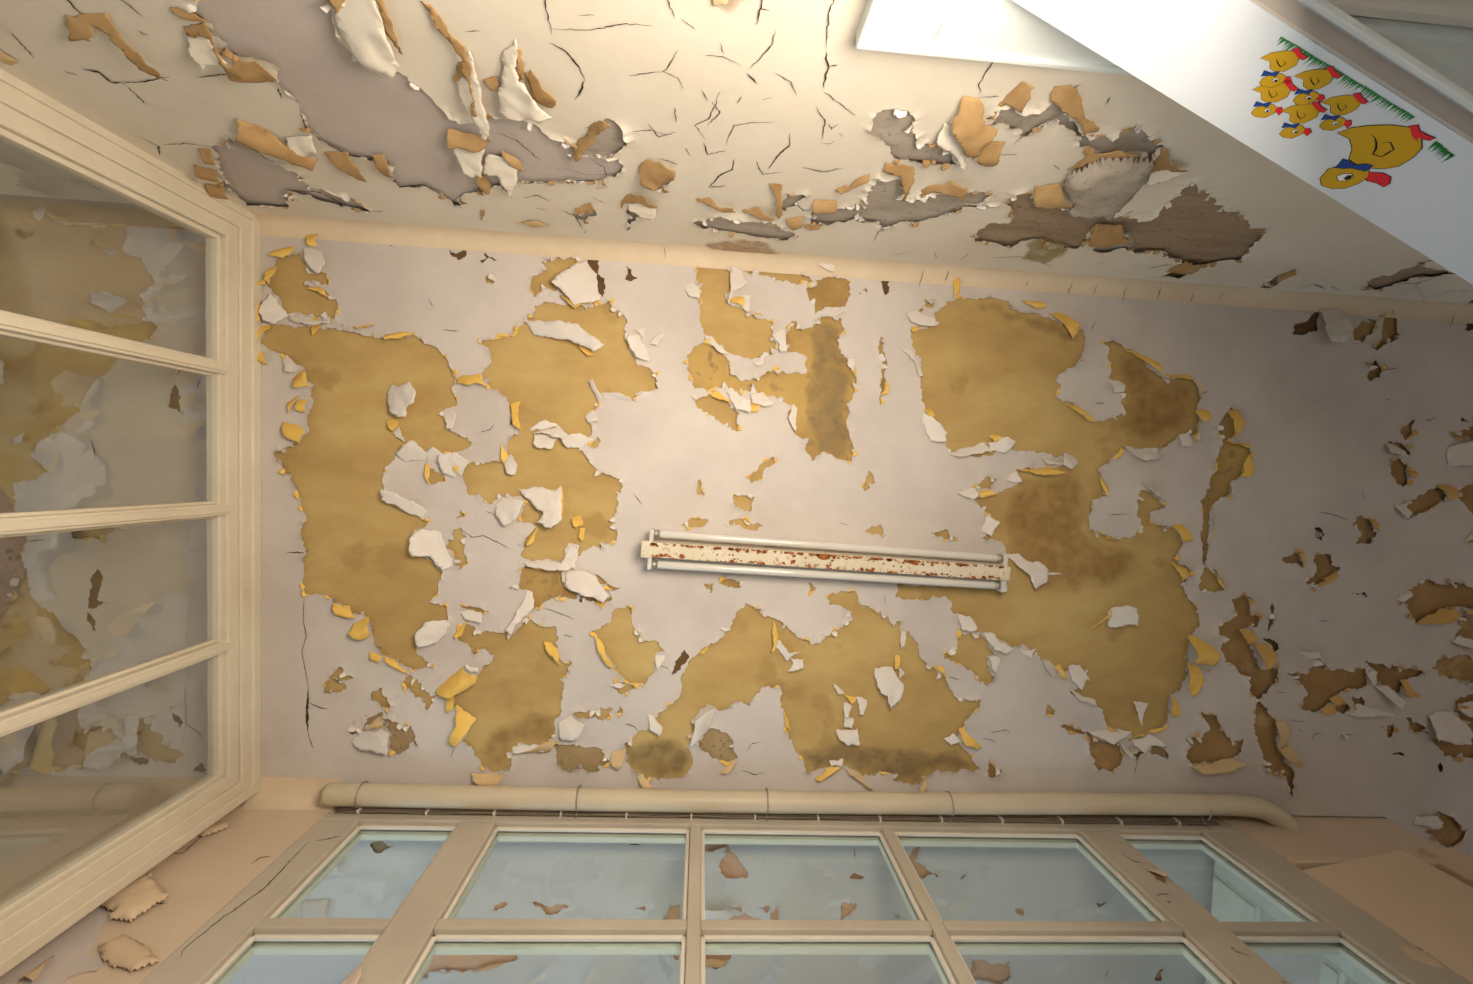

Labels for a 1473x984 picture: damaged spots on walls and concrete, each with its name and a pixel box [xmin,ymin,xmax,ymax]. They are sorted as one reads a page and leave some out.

spalling [170,0,675,232]
crack [501,134,620,233]
crack [544,0,853,211]
spalling [694,81,1267,277]
peeling [256,233,1473,795]
peeling [1146,869,1169,884]
peeling [1413,810,1468,848]